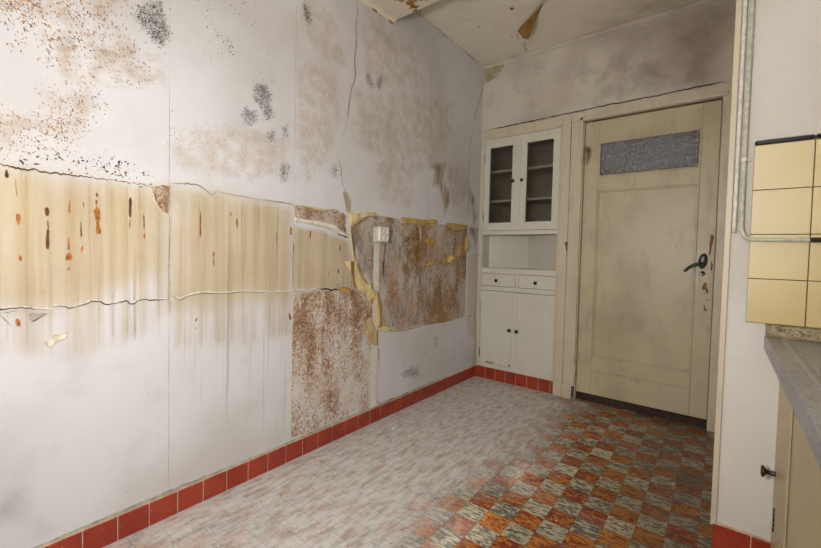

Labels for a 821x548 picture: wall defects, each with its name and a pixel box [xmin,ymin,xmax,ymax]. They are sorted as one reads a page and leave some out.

mould [130,0,172,55]
crack [343,1,359,136]
rust [93,193,101,234]
rust [65,222,83,270]
crack [0,188,316,325]